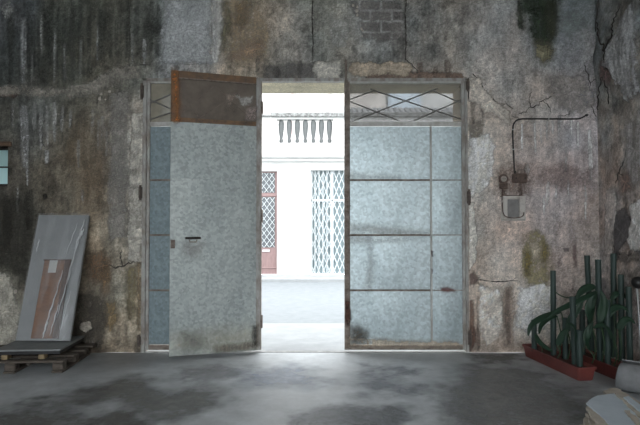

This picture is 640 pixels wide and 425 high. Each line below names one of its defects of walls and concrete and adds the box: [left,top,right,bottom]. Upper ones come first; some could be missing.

leakage [2,1,118,82]
crack [309,0,317,63]
spalling [349,61,413,77]
crack [404,0,418,71]
crack [473,74,573,118]
crack [584,0,620,116]
leakage [0,195,36,274]
crack [108,250,135,269]
leakage [525,241,547,275]